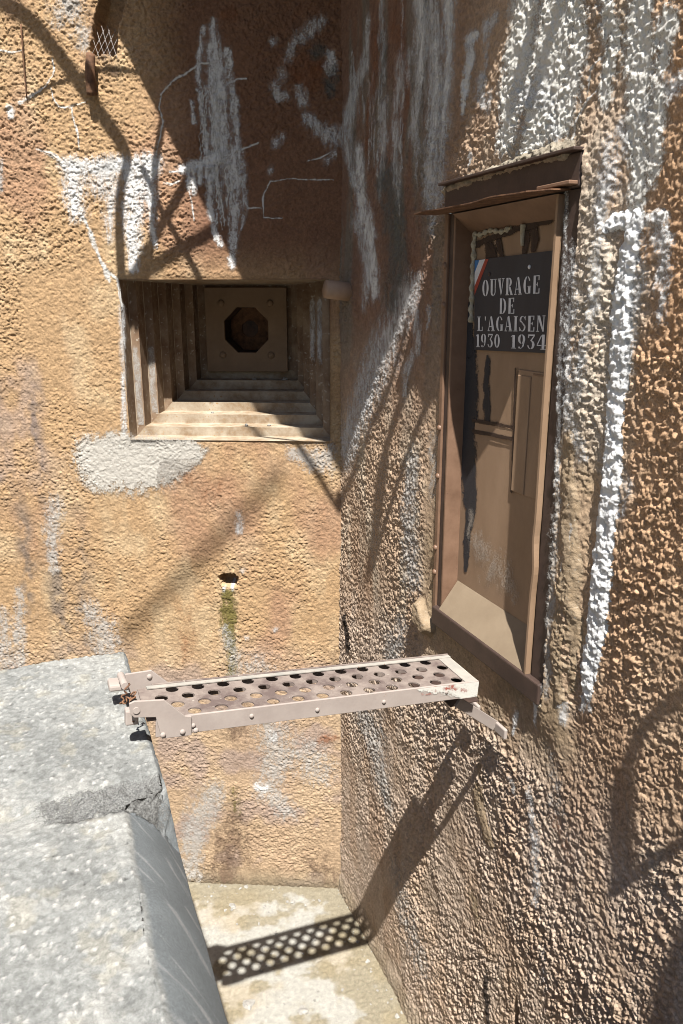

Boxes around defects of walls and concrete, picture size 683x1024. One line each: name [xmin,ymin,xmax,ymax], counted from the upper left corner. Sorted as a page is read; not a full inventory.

flaking render [71,348,209,495]
water stain [217,577,268,676]
spalling [33,774,170,840]
water stain [230,722,336,818]